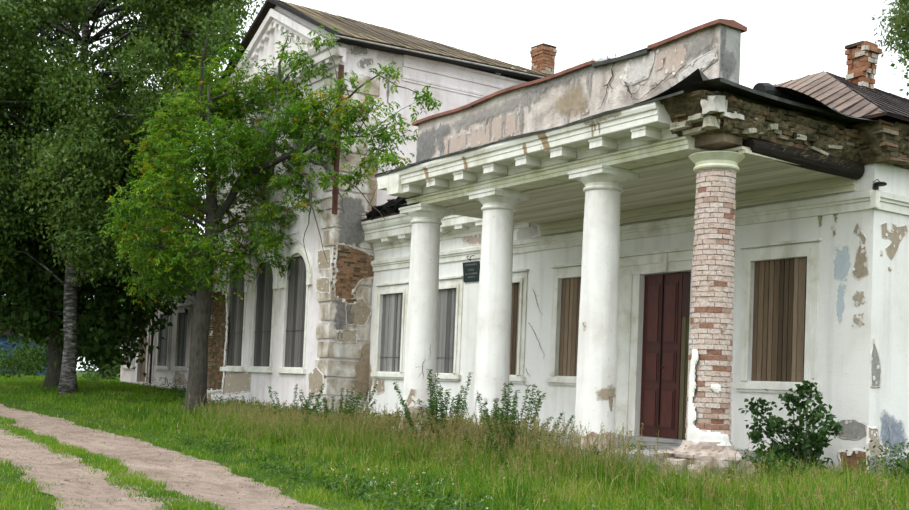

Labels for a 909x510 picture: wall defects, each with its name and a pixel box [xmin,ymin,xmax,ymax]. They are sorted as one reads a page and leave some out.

crack [598,54,672,109]
peeling [620,42,718,86]
peeling [444,111,523,155]
spalling [664,89,909,168]
peeling [852,222,870,281]
peeling [880,222,908,272]
spalling [316,242,375,344]
peeling [853,292,866,327]
flaking render [870,339,882,389]
spalling [837,425,890,477]